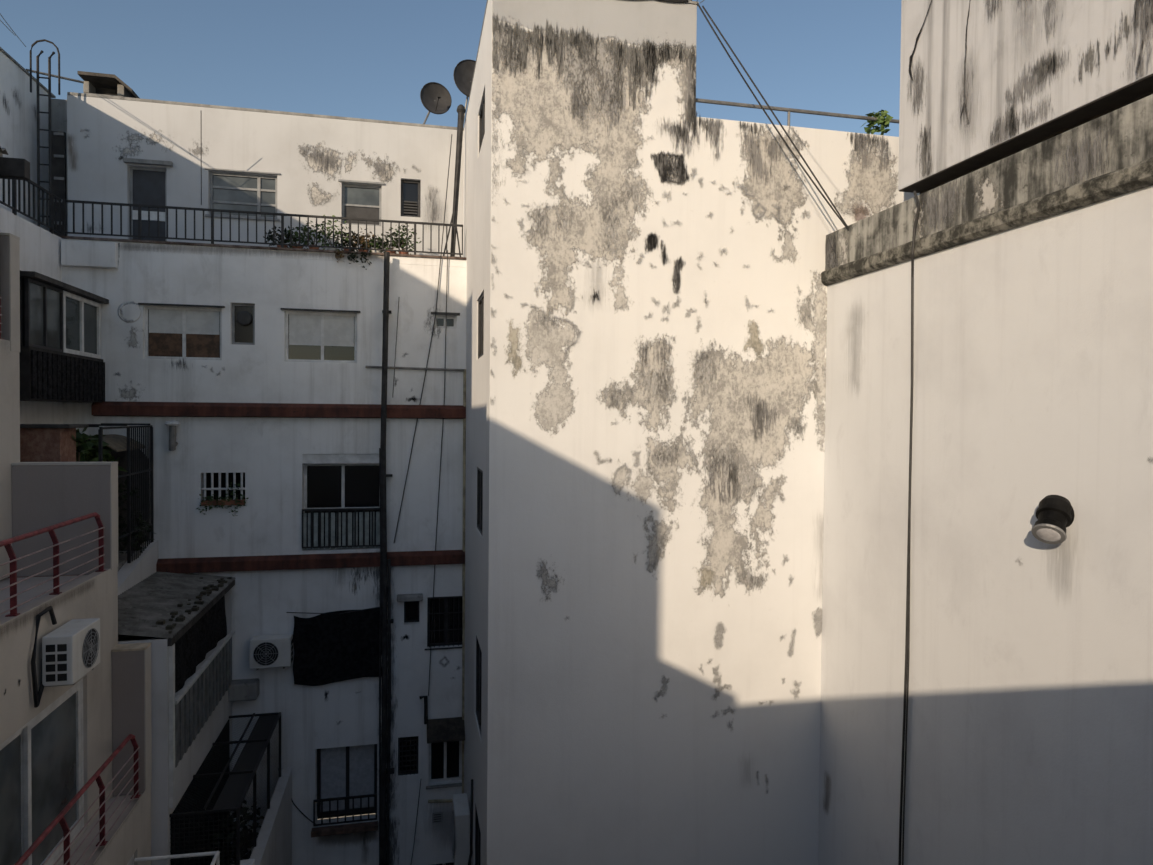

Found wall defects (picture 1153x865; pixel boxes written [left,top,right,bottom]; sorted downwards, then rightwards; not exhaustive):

leakage [492,17,720,157]
leakage [908,62,924,114]
leakage [991,0,1153,143]
peeling [299,142,419,205]
peeling [492,26,715,433]
peeling [728,126,808,262]
peeling [834,143,898,221]
leakage [916,127,932,176]
leakage [914,178,1002,238]
leakage [1054,130,1109,183]
peeling [595,273,827,597]
spalling [539,562,558,599]